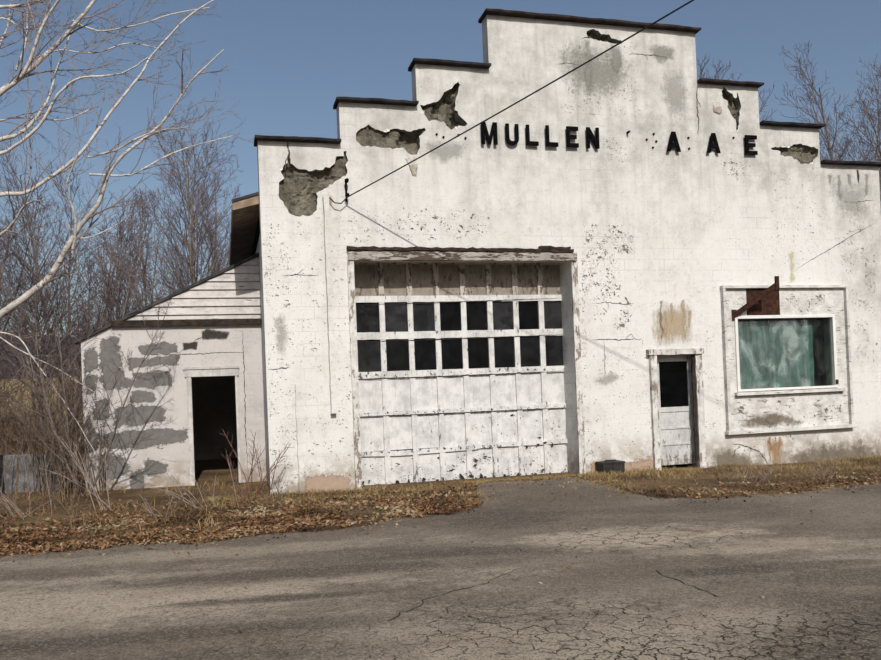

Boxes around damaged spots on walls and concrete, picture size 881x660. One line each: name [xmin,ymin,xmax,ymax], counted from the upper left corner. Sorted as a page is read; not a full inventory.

water stain [563,42,626,95]
spalling [561,29,641,115]
spalling [356,81,467,155]
spalling [721,87,742,132]
spalling [279,147,348,235]
spalling [769,143,825,243]
crack [793,200,873,272]
peeling [579,224,644,387]
corrosion [657,301,691,340]
crack [274,598,881,660]